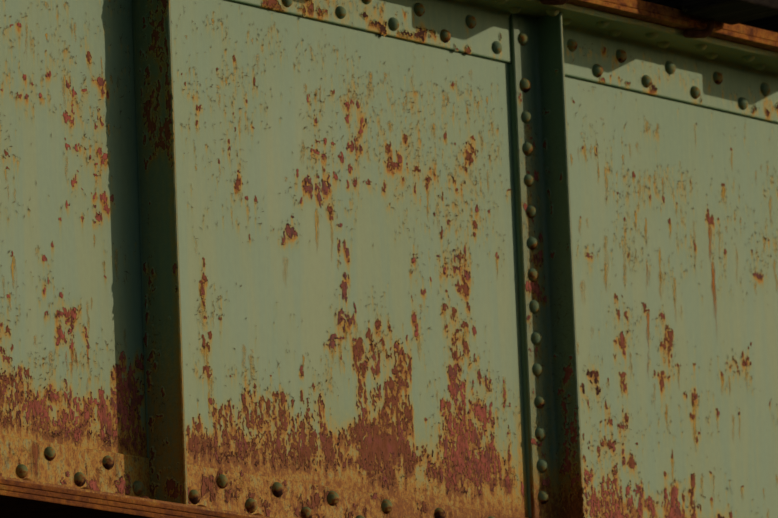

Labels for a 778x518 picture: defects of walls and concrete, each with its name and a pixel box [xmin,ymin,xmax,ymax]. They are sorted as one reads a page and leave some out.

peeling [139,0,175,171]
peeling [64,138,108,177]
peeling [71,170,115,224]
peeling [273,215,298,245]
corrosion [705,204,719,249]
peeling [0,261,166,460]
peeling [186,238,511,518]
corrosion [557,480,585,518]